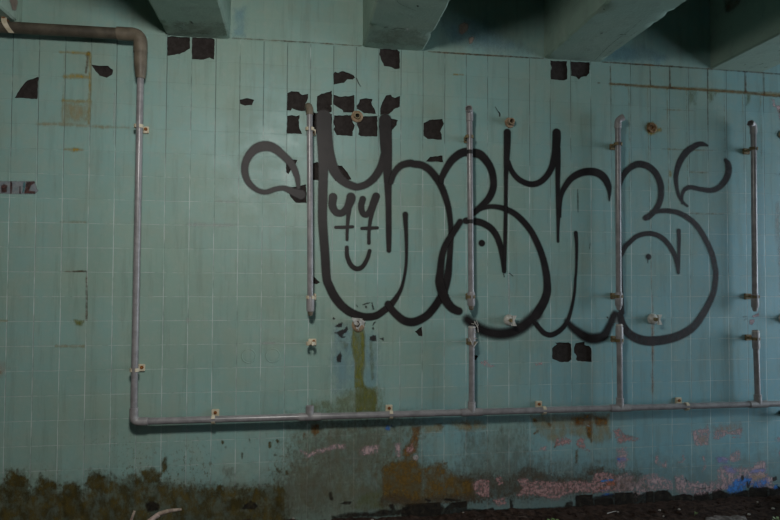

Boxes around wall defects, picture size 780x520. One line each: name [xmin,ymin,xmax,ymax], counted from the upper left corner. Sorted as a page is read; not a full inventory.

peeling [167,21,215,60]
peeling [379,49,400,69]
spalling [92,65,113,78]
peeling [550,61,590,80]
spalling [15,77,39,99]
spalling [287,71,400,137]
peeling [423,119,444,140]
damp [0,21,780,426]
peeling [552,342,592,362]
corrosion [380,427,482,506]
peeling [473,428,780,512]